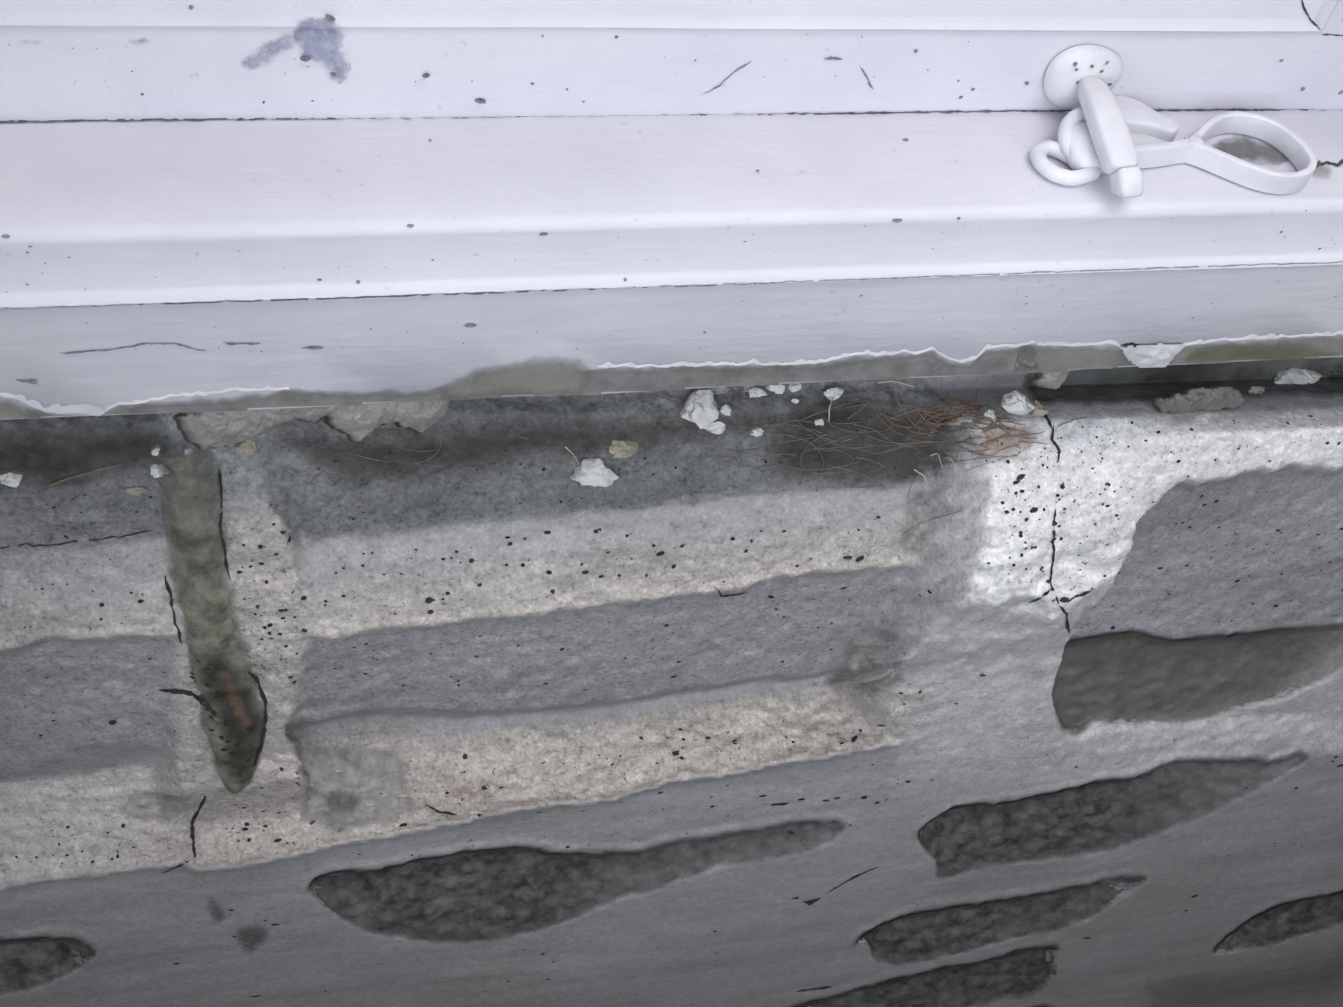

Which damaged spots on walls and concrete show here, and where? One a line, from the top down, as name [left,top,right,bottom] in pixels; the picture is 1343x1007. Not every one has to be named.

crack [0,115,555,123]
crack [609,108,1074,116]
crack [1153,106,1340,114]
crack [6,261,1342,309]
peeling [0,331,1343,419]
crack [1033,398,1060,463]
crack [1028,509,1091,633]
spalling [1052,628,1329,730]
spalling [918,762,1232,876]
spalling [309,822,841,942]
spalling [796,878,1146,1007]
spalling [1214,892,1343,952]